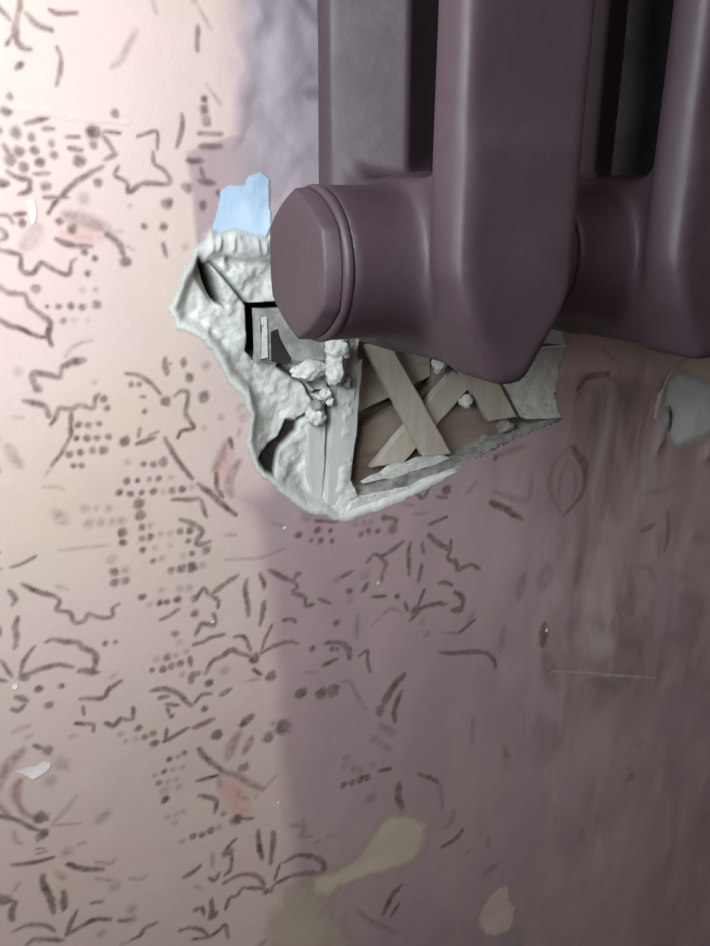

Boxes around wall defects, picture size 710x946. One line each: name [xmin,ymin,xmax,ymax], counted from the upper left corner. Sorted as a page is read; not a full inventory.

flaking render [168,172,566,522]
flaking render [653,357,710,454]